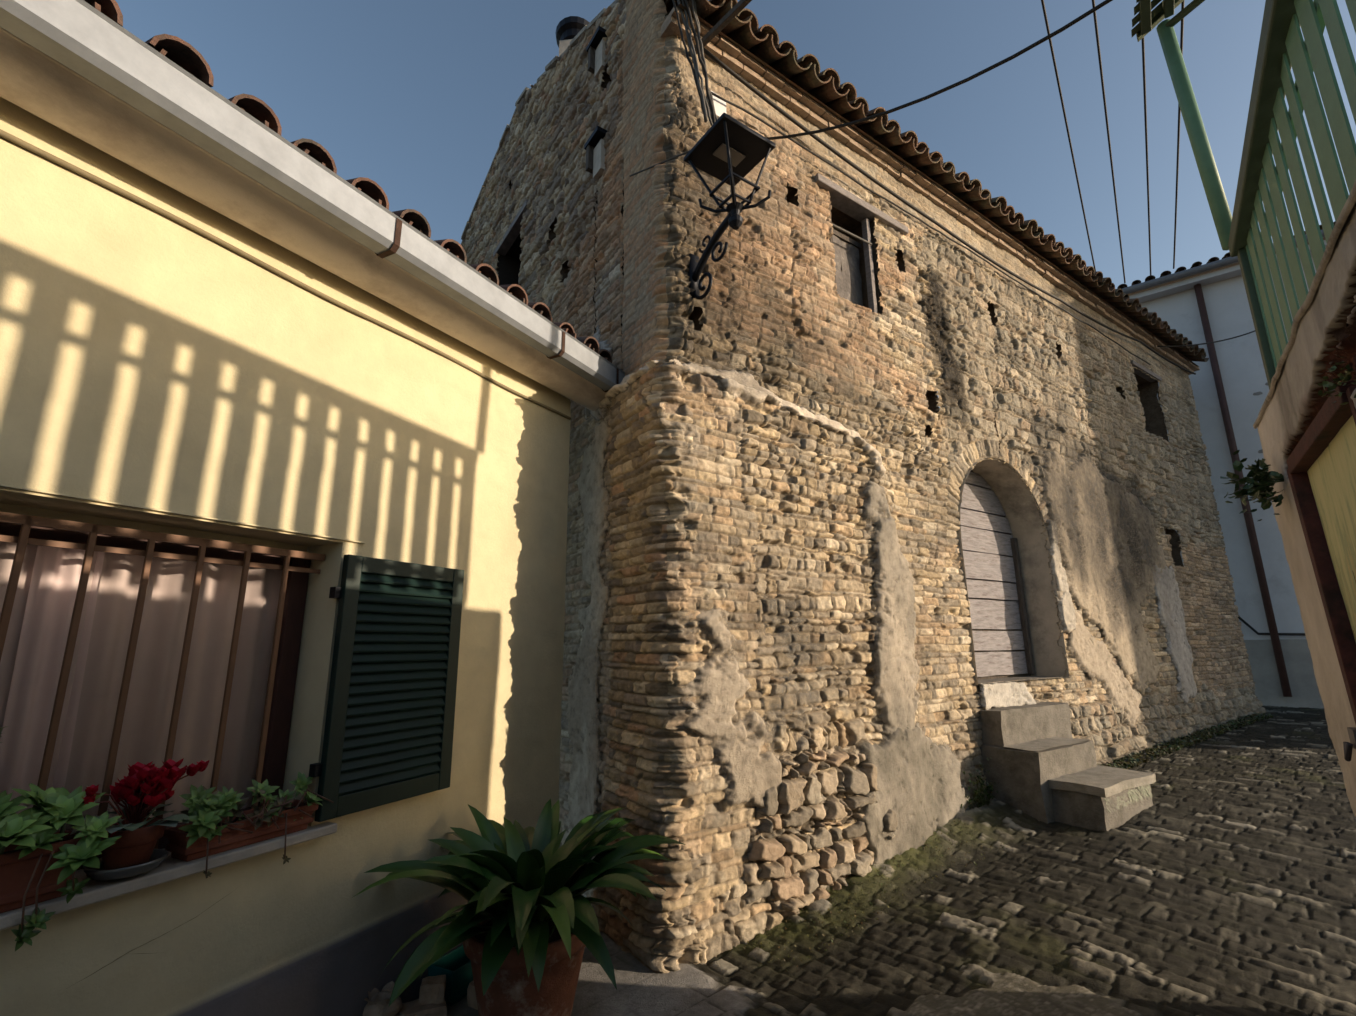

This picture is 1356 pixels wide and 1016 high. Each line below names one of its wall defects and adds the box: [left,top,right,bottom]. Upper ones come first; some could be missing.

peeling [593,325,611,352]
water stain [918,271,967,416]
spalling [562,359,978,917]
flaking render [1043,451,1197,728]